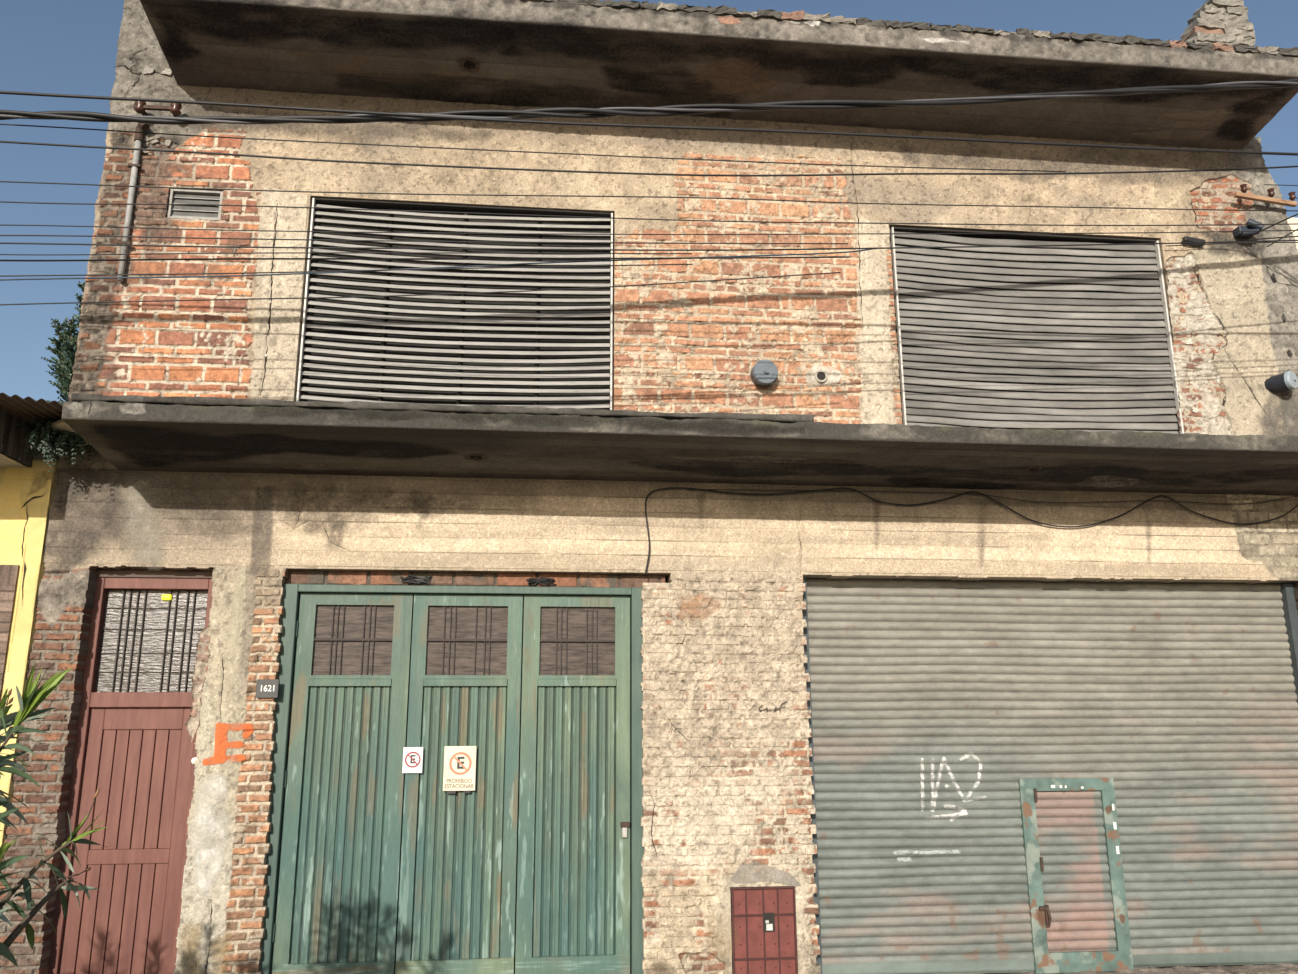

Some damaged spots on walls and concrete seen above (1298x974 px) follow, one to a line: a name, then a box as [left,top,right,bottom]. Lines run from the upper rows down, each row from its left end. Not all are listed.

leakage [158,0,1290,183]
flaking render [140,137,178,156]
flaking render [1190,174,1254,234]
flaking render [1166,252,1232,435]
spalling [814,370,827,383]
leakage [1262,393,1298,436]
leakage [94,425,454,574]
crack [21,489,48,598]
spalling [679,950,725,974]